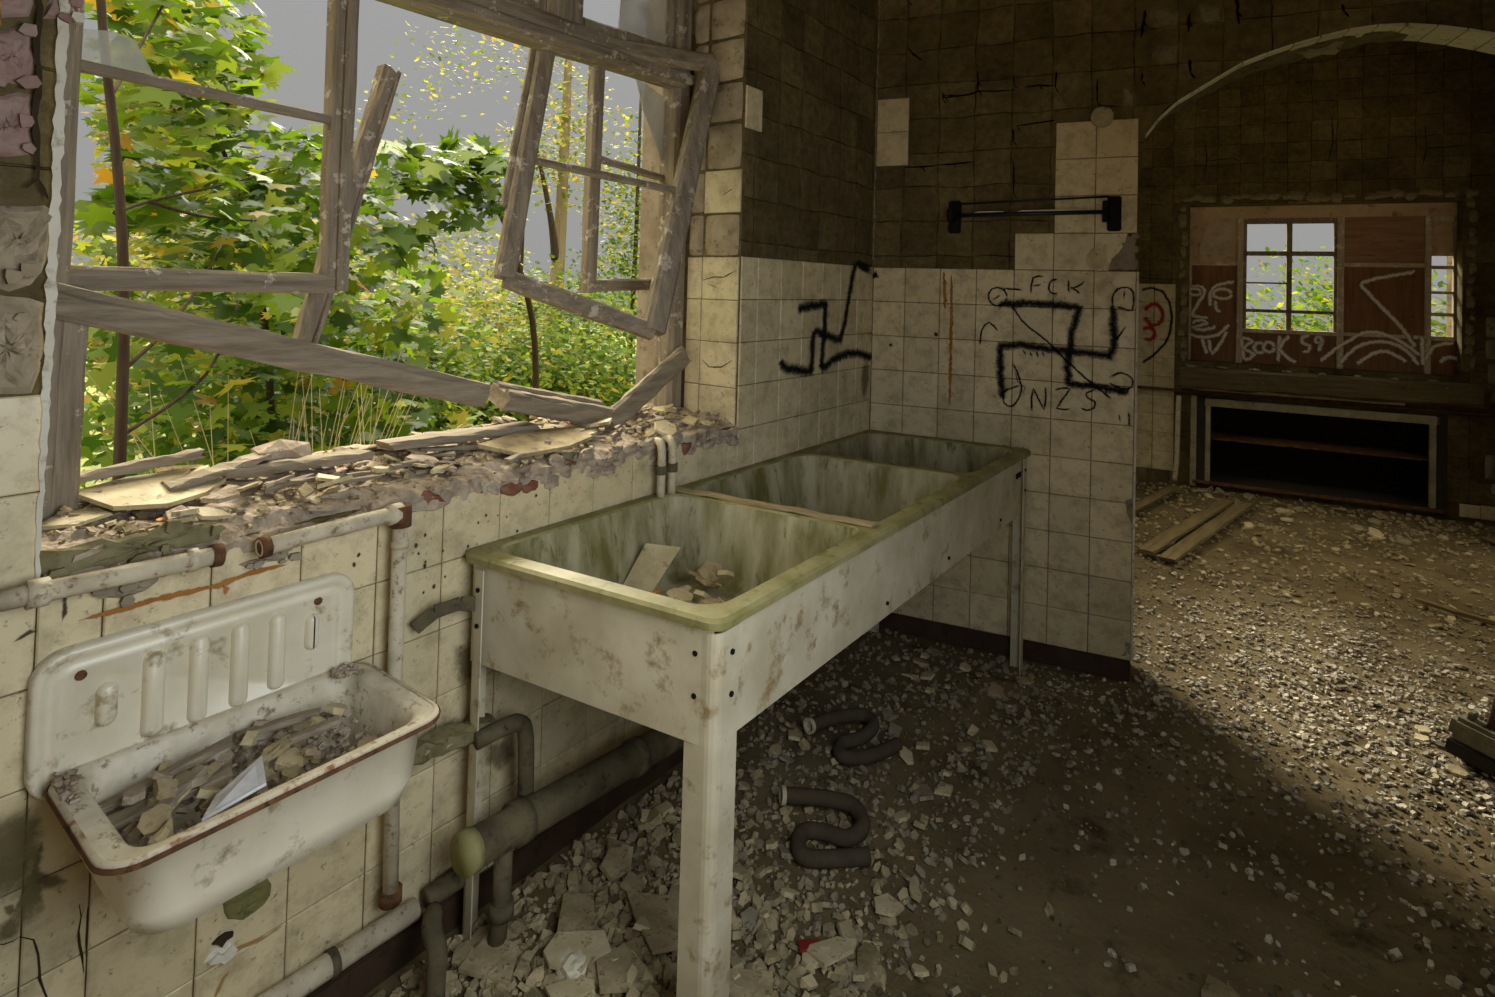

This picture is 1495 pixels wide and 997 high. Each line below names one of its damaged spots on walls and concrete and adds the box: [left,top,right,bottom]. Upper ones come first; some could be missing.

spalling [1108,234,1140,270]
spalling [403,430,739,505]
flaking render [39,519,226,579]
flaking render [238,548,302,570]
flaking render [90,577,159,608]
corrosion [82,565,285,620]
crack [0,936,48,997]
crack [75,904,88,973]